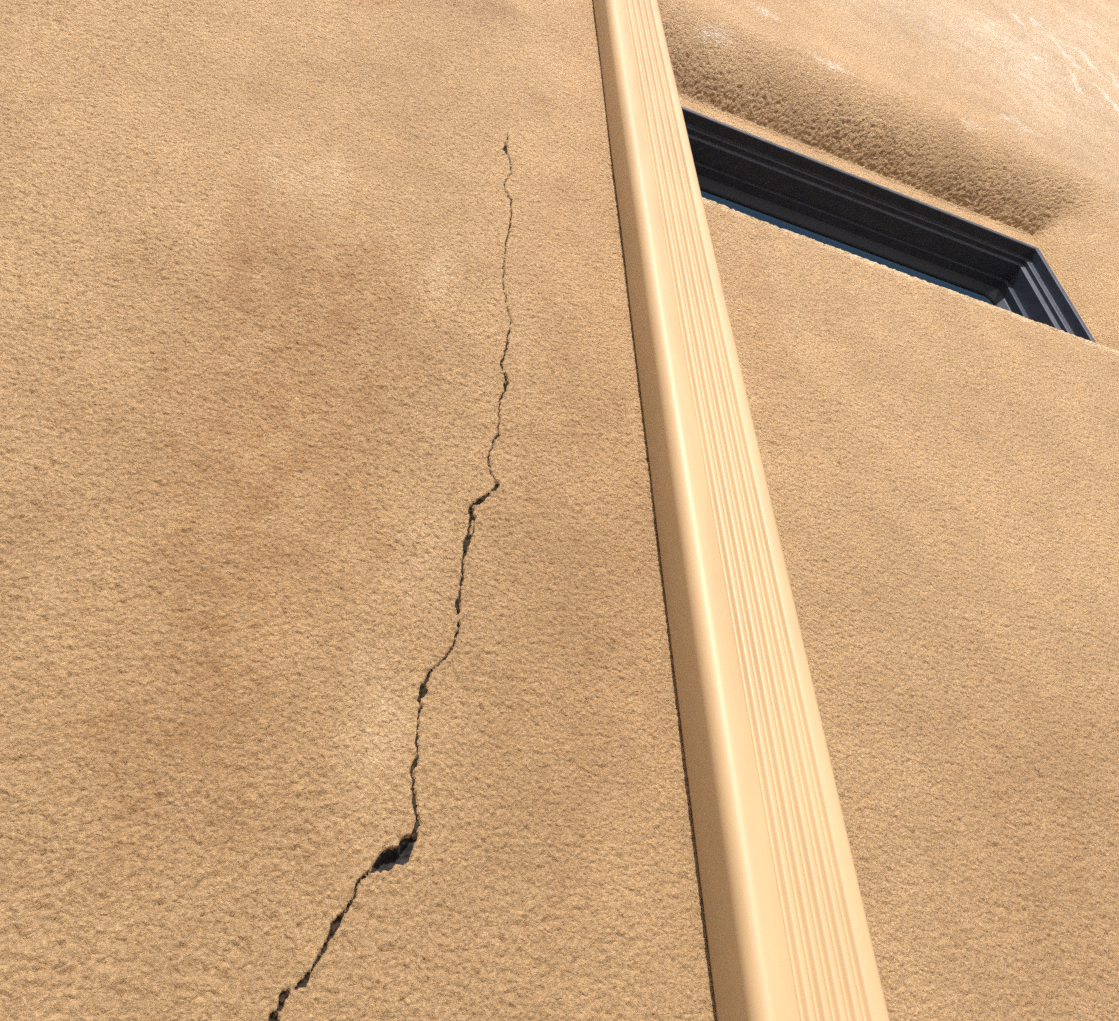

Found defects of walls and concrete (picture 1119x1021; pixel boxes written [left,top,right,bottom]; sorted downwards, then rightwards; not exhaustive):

crack [268,136,512,1021]